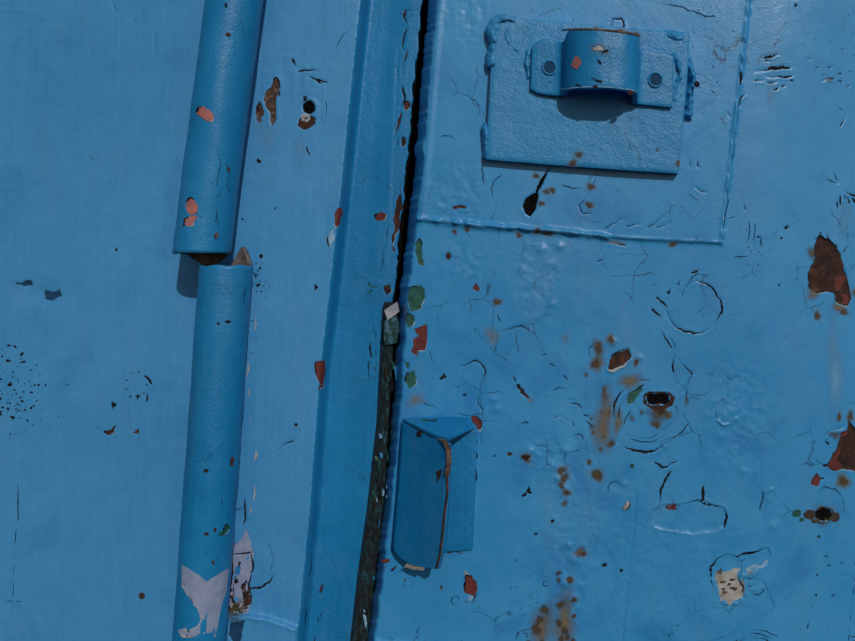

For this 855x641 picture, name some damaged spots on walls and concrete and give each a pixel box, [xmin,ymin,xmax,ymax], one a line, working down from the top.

crack [660,1,734,93]
peeling [255,77,280,126]
crack [396,86,411,146]
crack [563,179,665,229]
peeling [404,285,427,389]
peeling [415,238,424,266]
crack [652,270,723,347]
corrosion [808,232,855,314]
corrosion [817,412,855,485]
peeling [178,529,254,641]
corrosion [533,598,576,641]
peeling [710,547,771,606]